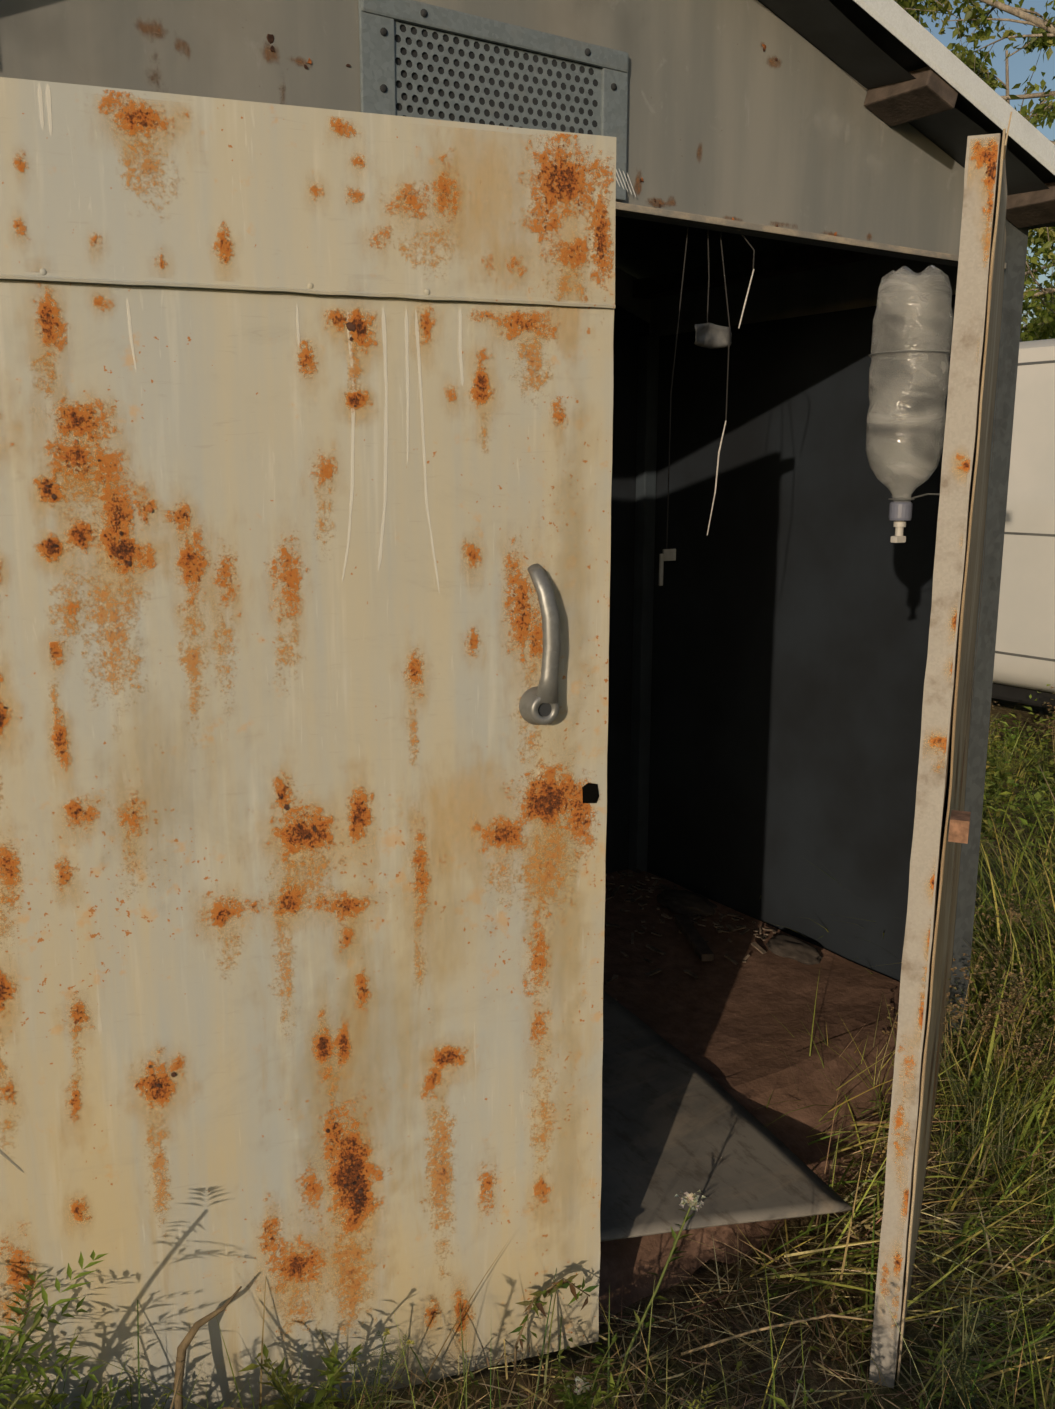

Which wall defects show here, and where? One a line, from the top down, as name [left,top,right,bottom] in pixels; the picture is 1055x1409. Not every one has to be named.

corrosion [98,89,188,205]
corrosion [370,155,462,267]
corrosion [471,133,614,391]
corrosion [971,139,998,260]
corrosion [446,348,494,406]
corrosion [33,285,241,714]
corrosion [271,535,307,664]
corrosion [505,539,543,687]
corrosion [201,775,374,1021]
corrosion [470,712,595,1203]
corrosion [135,1050,184,1212]
corrosion [259,1010,391,1335]